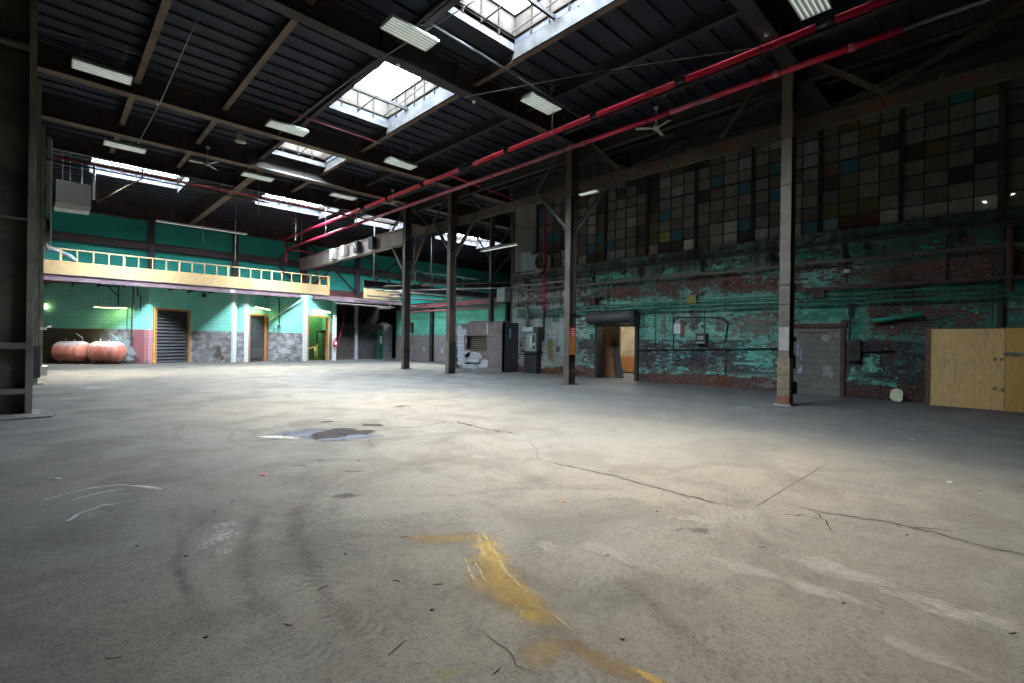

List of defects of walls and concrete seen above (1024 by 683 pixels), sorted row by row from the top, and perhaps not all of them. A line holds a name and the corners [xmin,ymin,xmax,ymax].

peeling [576,261,779,386]
leakage [259,428,373,439]
crack [351,421,1024,555]
crack [466,627,538,674]